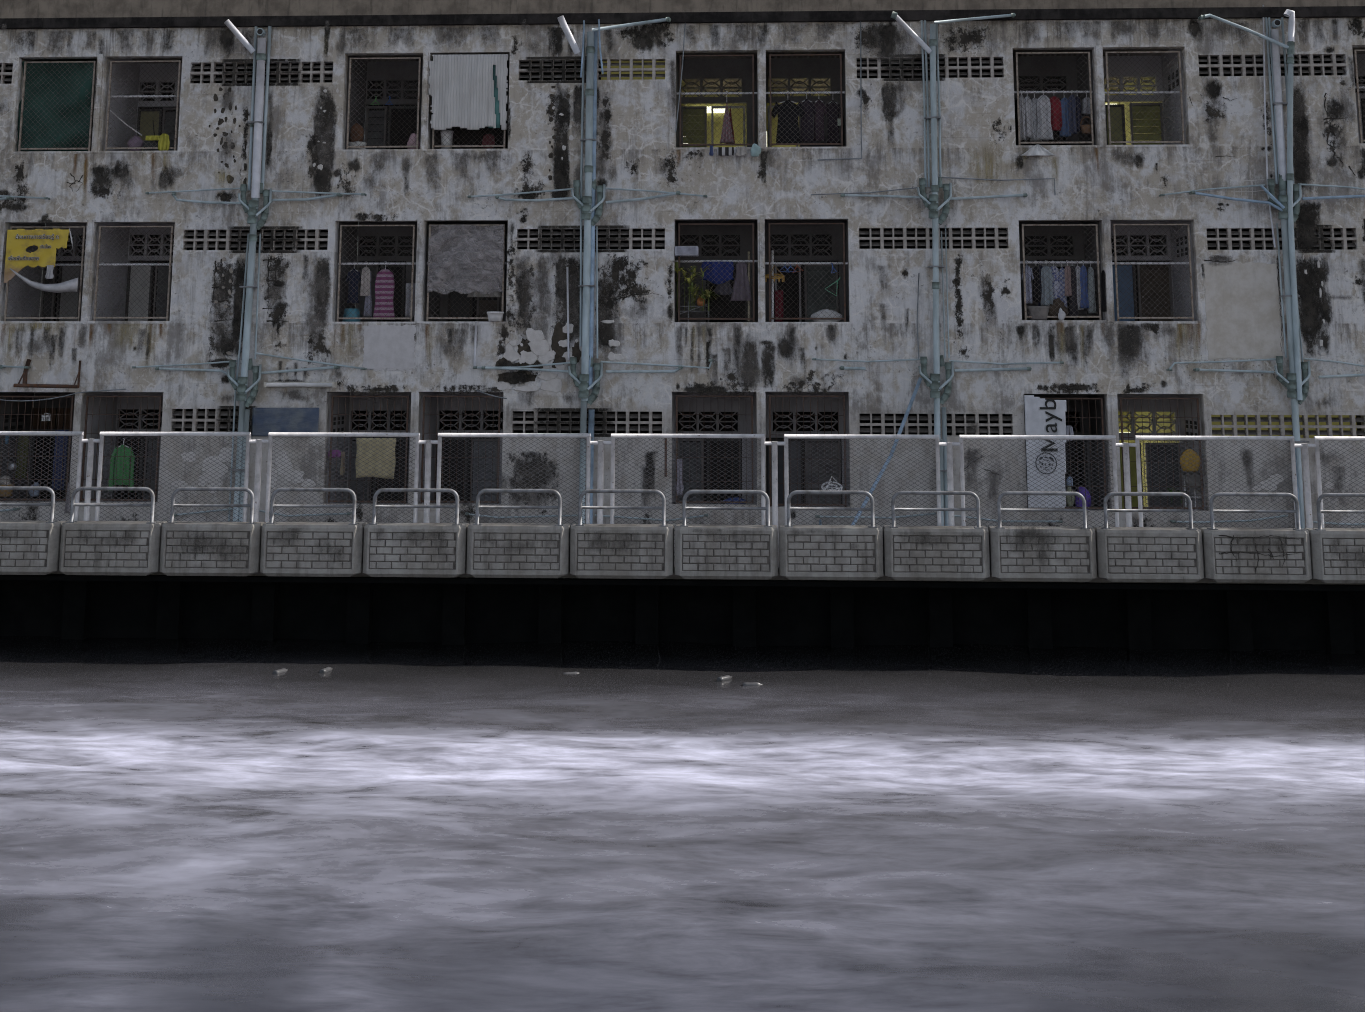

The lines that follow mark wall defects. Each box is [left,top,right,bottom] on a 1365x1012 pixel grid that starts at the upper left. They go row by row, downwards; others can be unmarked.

damp [1299,17,1365,53]
damp [206,28,300,202]
damp [305,87,384,197]
damp [88,160,131,199]
damp [431,23,848,437]
damp [1293,58,1365,356]
damp [208,226,407,432]
spalling [492,321,581,393]
spalling [601,320,624,361]
spalling [514,411,662,433]
damp [503,451,558,514]
damp [642,452,656,524]